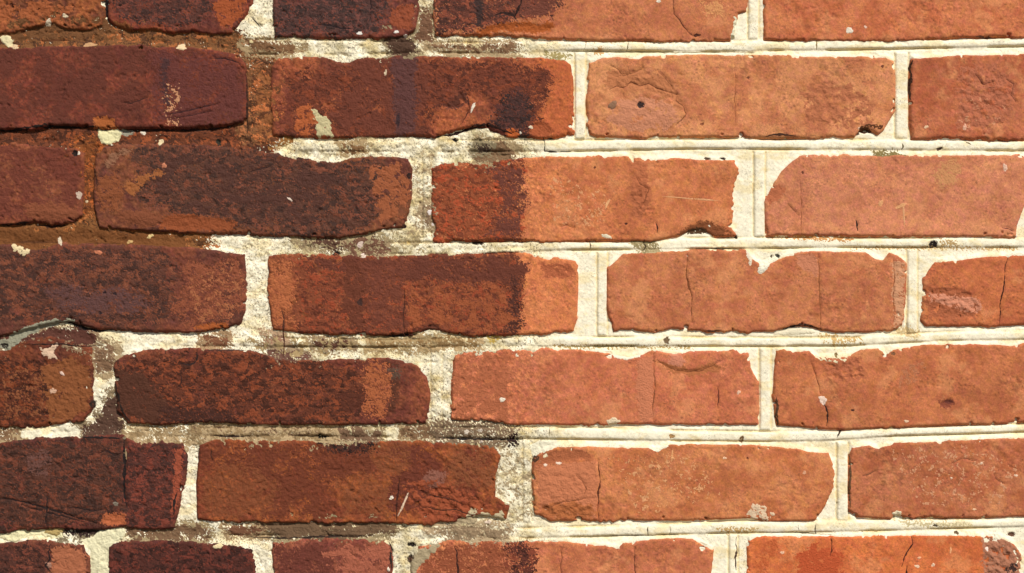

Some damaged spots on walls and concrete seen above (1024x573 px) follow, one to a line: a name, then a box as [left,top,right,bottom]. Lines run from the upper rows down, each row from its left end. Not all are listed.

damp [463,131,526,169]
spalling [921,286,984,323]
crack [999,259,1008,325]
crack [811,363,842,437]
spalling [979,537,1021,573]